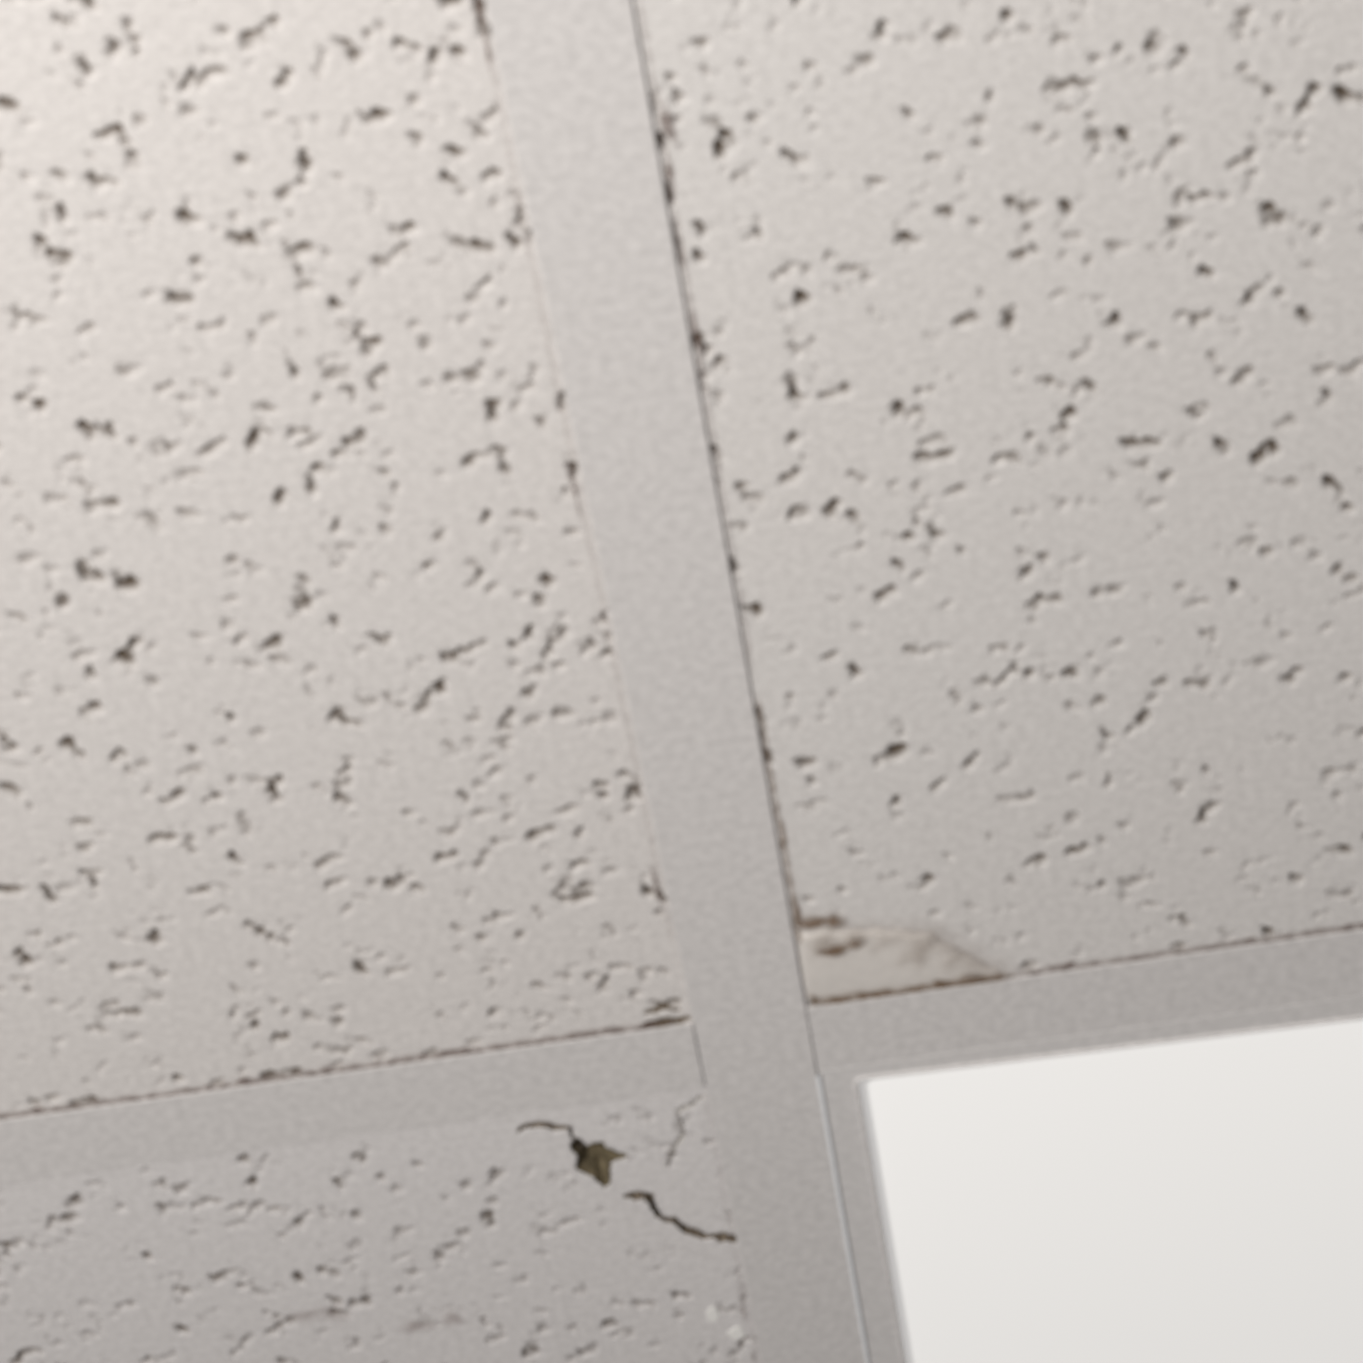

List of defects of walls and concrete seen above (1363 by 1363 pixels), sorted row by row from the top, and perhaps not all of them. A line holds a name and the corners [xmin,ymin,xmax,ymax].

leakage [812,975,1004,1004]
crack [518,1095,737,1243]